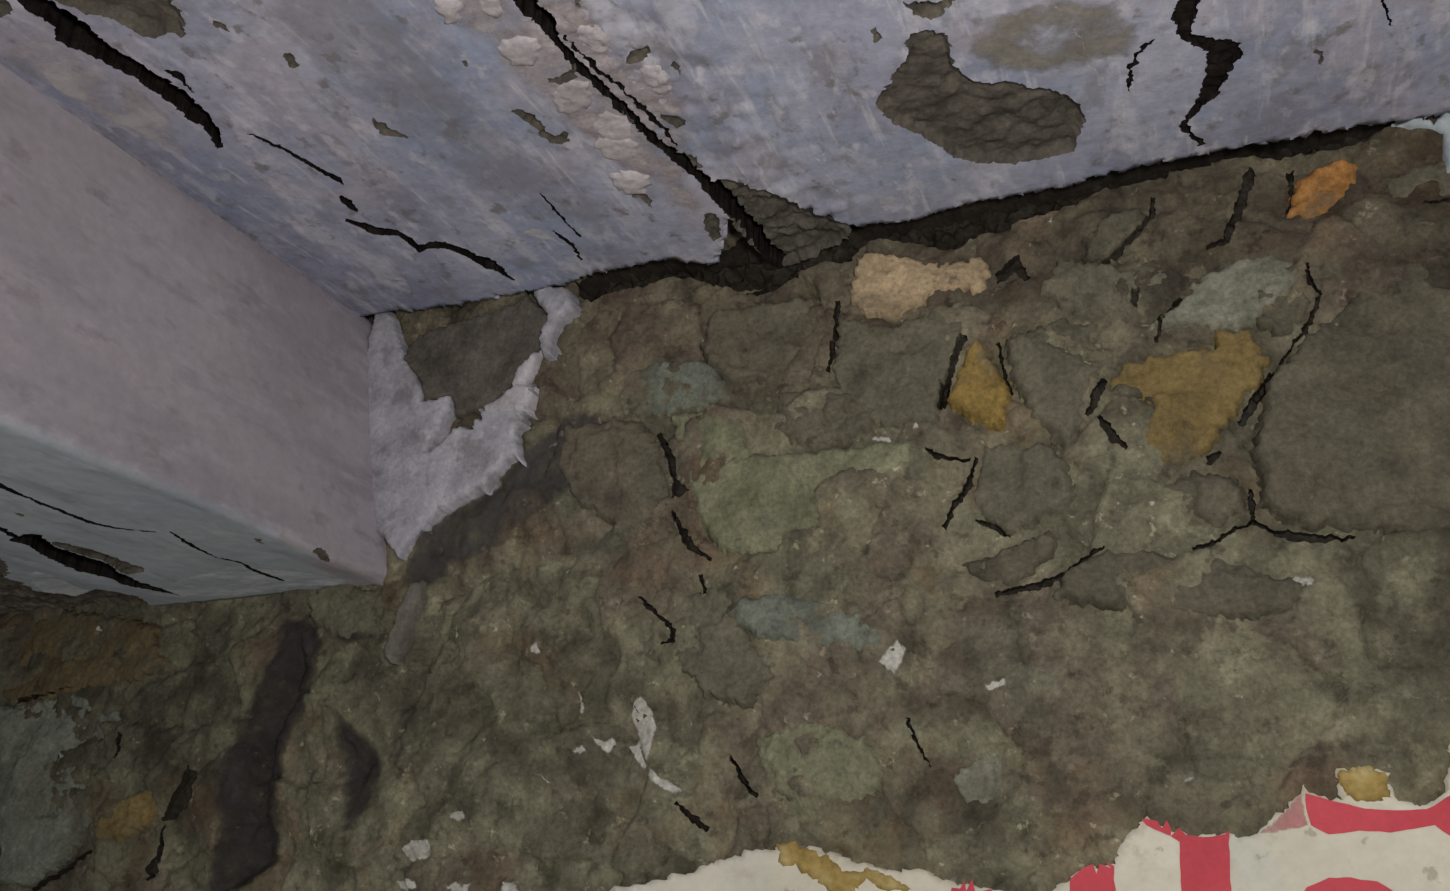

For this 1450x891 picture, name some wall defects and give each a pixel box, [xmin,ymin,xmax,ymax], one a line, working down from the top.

crack [17,0,534,295]
crack [513,0,1441,343]
spalling [876,0,1086,165]
spalling [849,253,991,324]
crack [0,483,285,595]
peeling [364,292,548,561]
spalling [691,441,911,558]
crack [925,447,1007,537]
crack [1192,489,1356,550]
spalling [1249,262,1450,535]
damp [211,622,320,891]
damp [336,722,380,825]